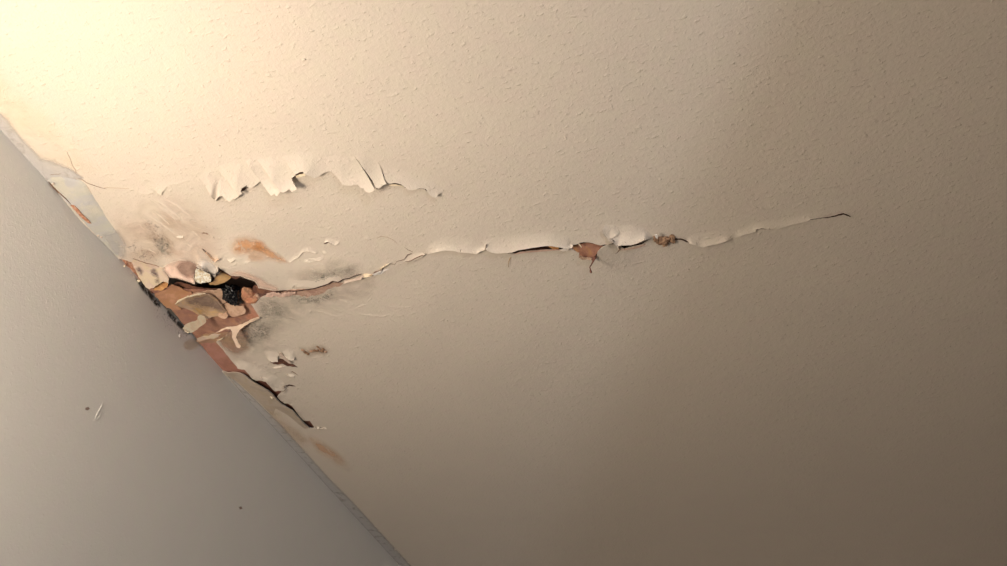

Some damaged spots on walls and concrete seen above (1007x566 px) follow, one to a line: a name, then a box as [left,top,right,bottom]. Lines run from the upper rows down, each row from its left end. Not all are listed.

peeling [200,151,446,202]
peeling [132,260,169,289]
leakage [129,221,194,283]
crack [275,212,851,298]
peeling [175,269,260,348]
peeling [264,346,327,377]